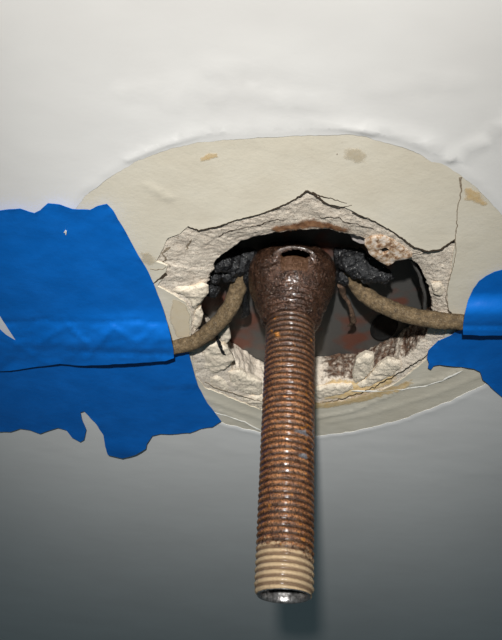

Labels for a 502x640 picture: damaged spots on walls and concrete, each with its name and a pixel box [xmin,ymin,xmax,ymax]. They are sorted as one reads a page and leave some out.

crack [152,247,170,283]
peeling [76,134,502,341]
corrosion [272,220,347,232]
crack [186,177,462,314]
flaking render [189,324,264,432]
peeling [314,325,486,436]